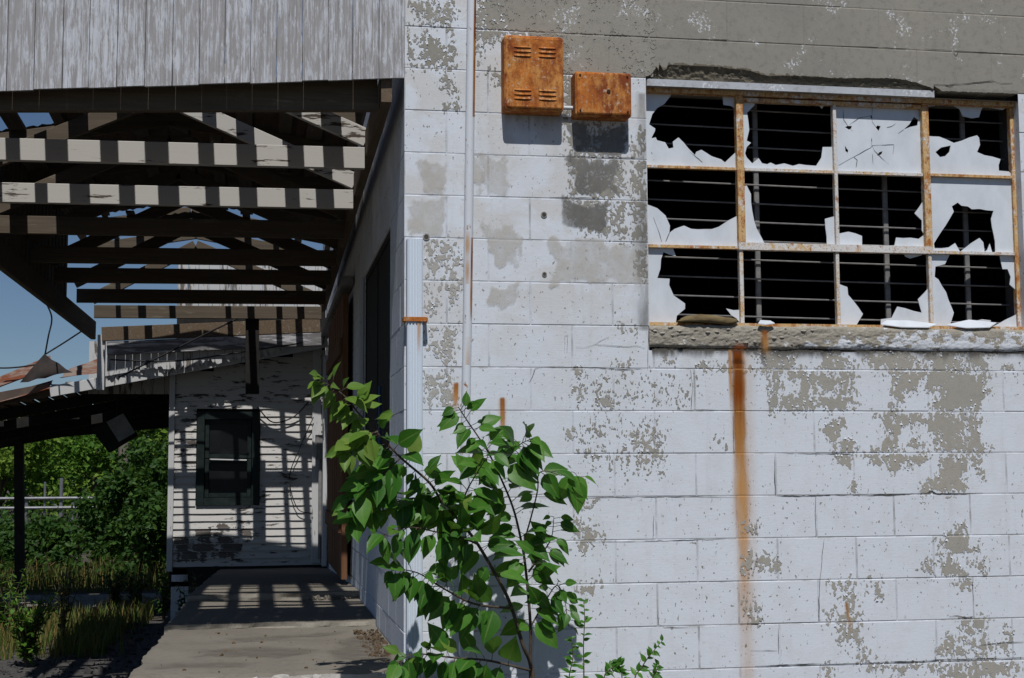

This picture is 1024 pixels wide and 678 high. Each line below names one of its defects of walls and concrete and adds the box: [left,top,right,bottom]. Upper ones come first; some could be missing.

peeling [407,0,935,283]
peeling [423,235,464,413]
rust [729,344,747,547]
peeling [563,319,1021,499]
peeling [818,572,1024,678]
peeling [921,519,991,595]